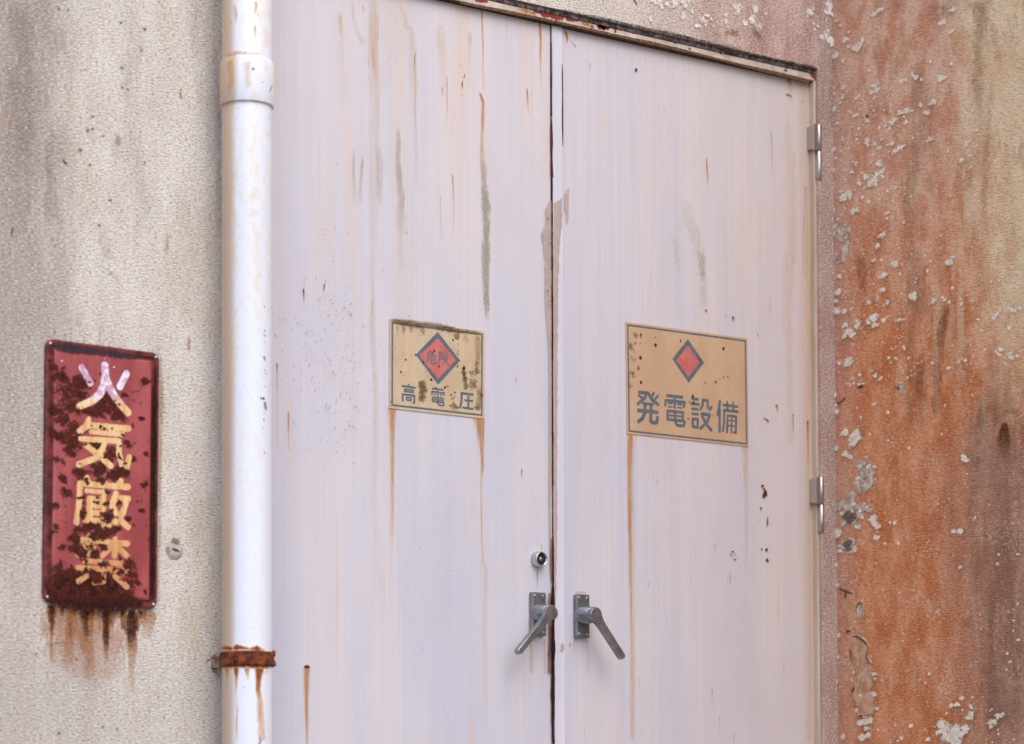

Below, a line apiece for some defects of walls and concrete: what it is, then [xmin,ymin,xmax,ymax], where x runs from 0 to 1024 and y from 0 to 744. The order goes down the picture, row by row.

leakage [482,187,490,310]
leakage [542,189,570,602]
corrosion [998,422,1010,444]
spalling [836,460,877,554]
corrosion [47,605,155,656]
corrosion [222,644,276,722]
peeling [849,634,879,741]